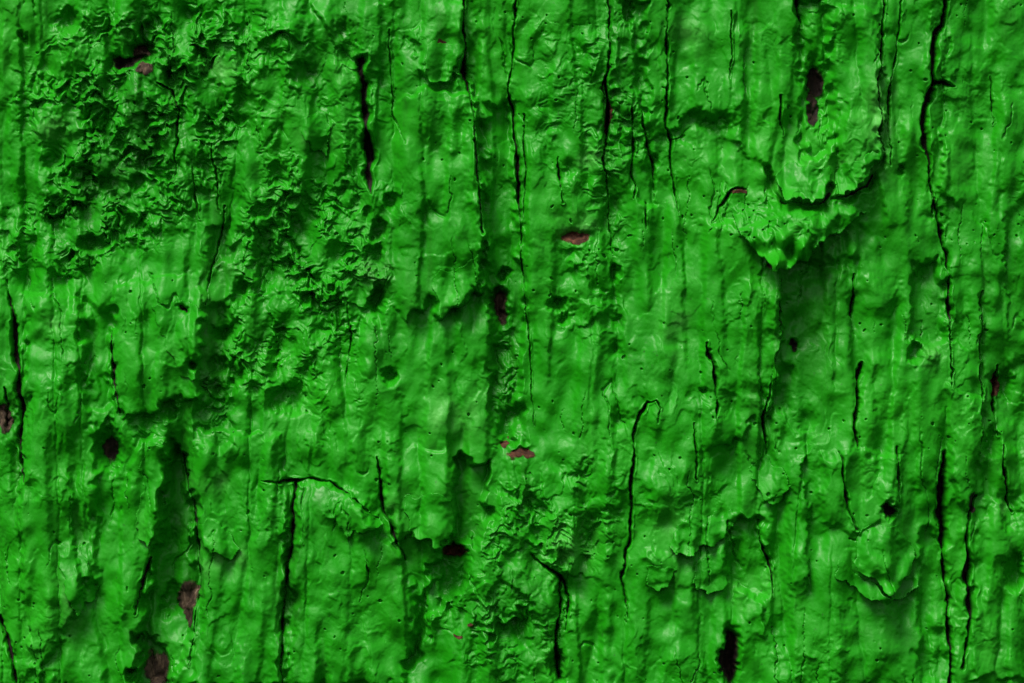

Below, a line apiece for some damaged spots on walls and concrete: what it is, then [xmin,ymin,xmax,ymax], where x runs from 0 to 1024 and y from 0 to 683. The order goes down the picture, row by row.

crack [358,57,374,194]
peeling [806,68,824,126]
crack [920,0,953,339]
peeling [561,232,589,245]
peeling [500,436,535,460]
peeling [144,649,169,683]
peeling [177,580,201,628]
crack [269,465,397,654]
crack [543,565,569,678]
crack [620,400,660,614]
crack [935,453,975,683]